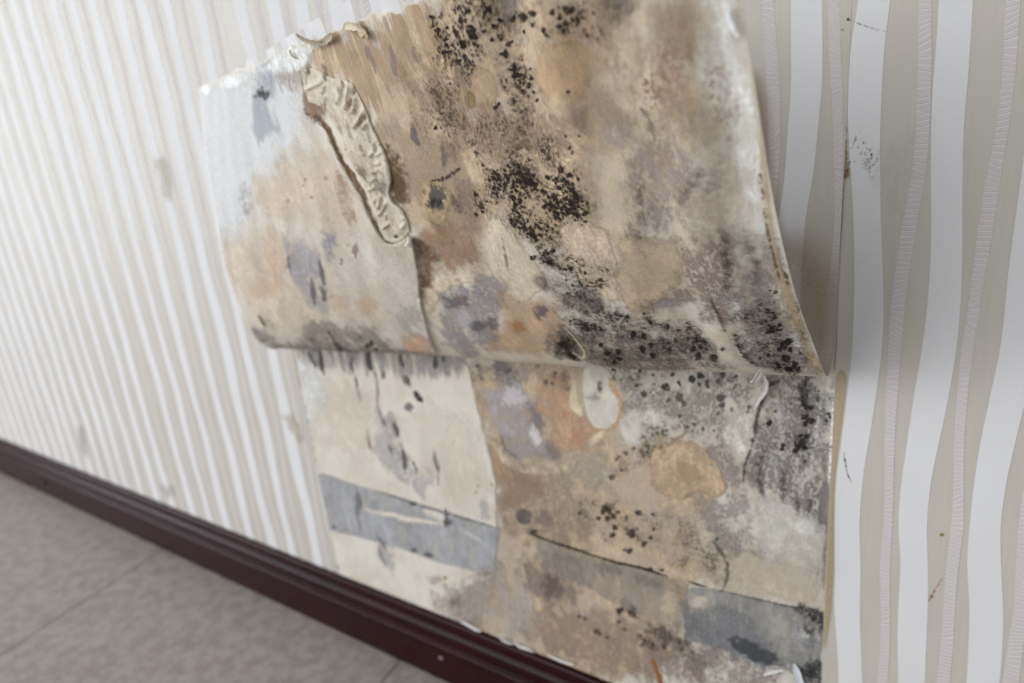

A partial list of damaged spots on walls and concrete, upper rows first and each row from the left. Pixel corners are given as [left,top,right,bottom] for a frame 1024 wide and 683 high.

water stain [200,0,845,683]
peeling [363,508,444,527]
crack [527,529,823,615]
peeling [689,593,712,613]
peeling [763,663,804,683]